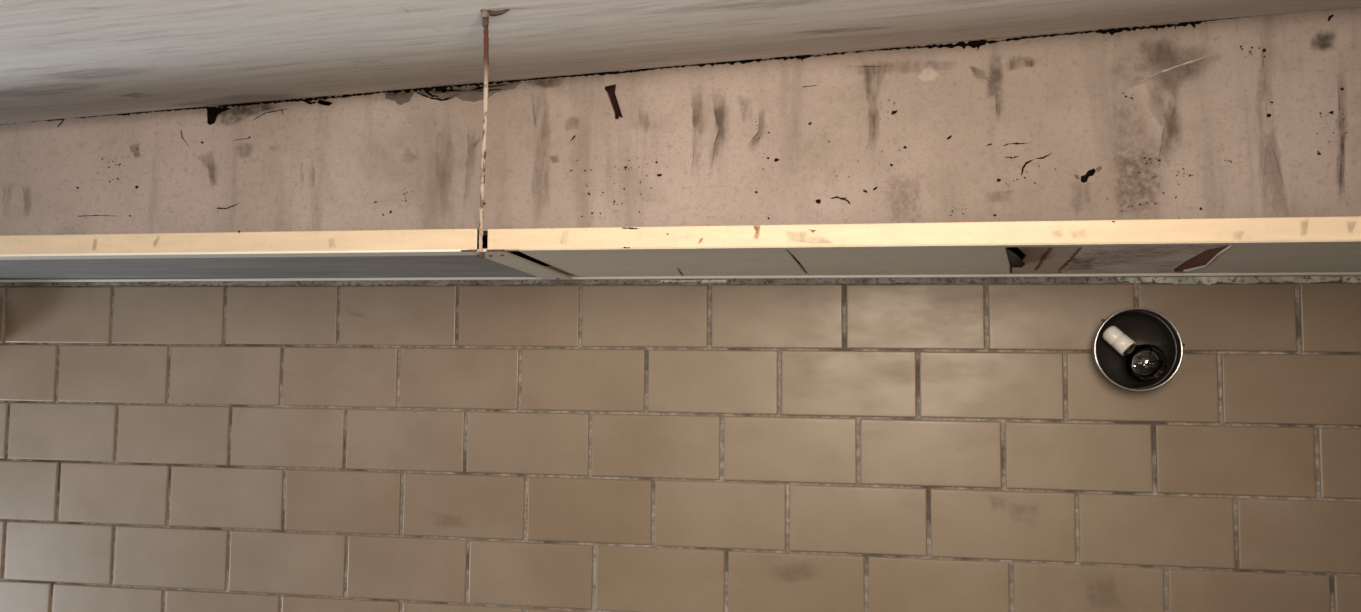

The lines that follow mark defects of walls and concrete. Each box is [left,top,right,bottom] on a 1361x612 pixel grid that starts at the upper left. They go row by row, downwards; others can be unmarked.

peeling [380,81,521,105]
peeling [207,105,286,138]